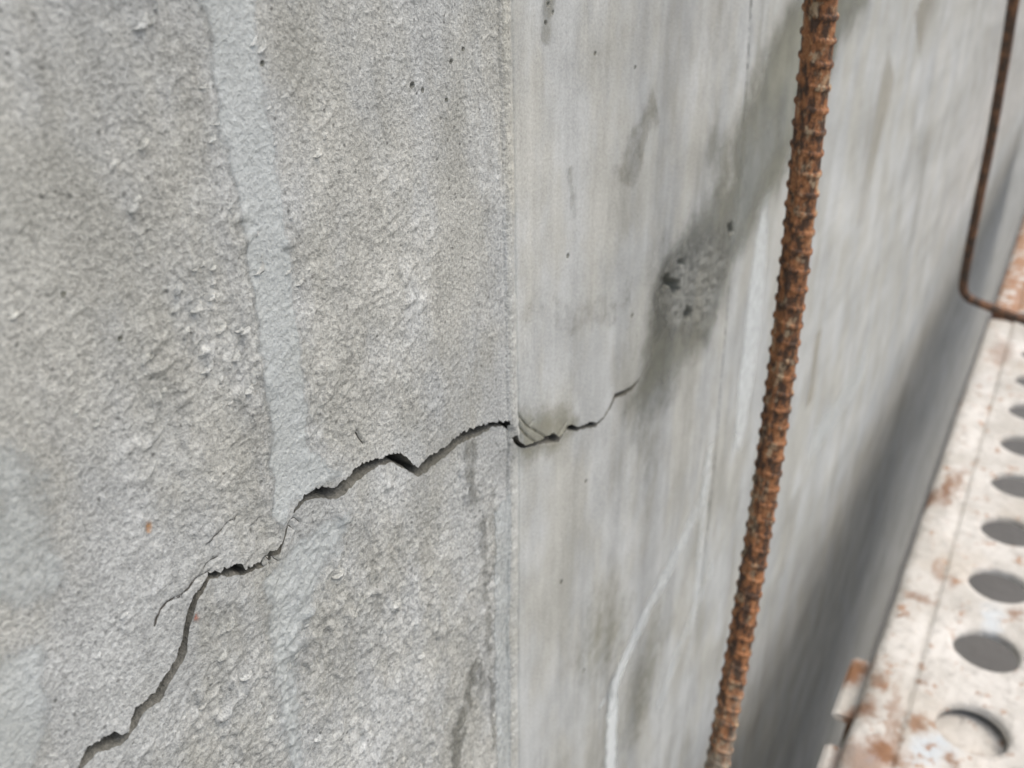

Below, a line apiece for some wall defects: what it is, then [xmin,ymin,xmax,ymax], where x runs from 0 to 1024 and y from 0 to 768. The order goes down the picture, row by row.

leakage [637,0,804,446]
crack [78,359,651,768]